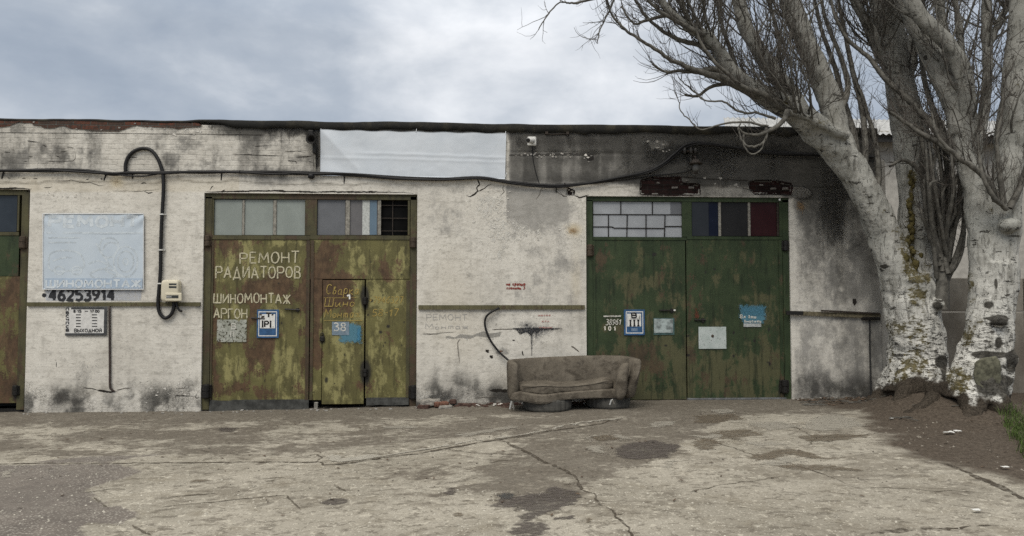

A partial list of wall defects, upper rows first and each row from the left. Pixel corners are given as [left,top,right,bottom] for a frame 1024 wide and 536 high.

water stain [265,128,319,167]
crack [12,417,634,536]